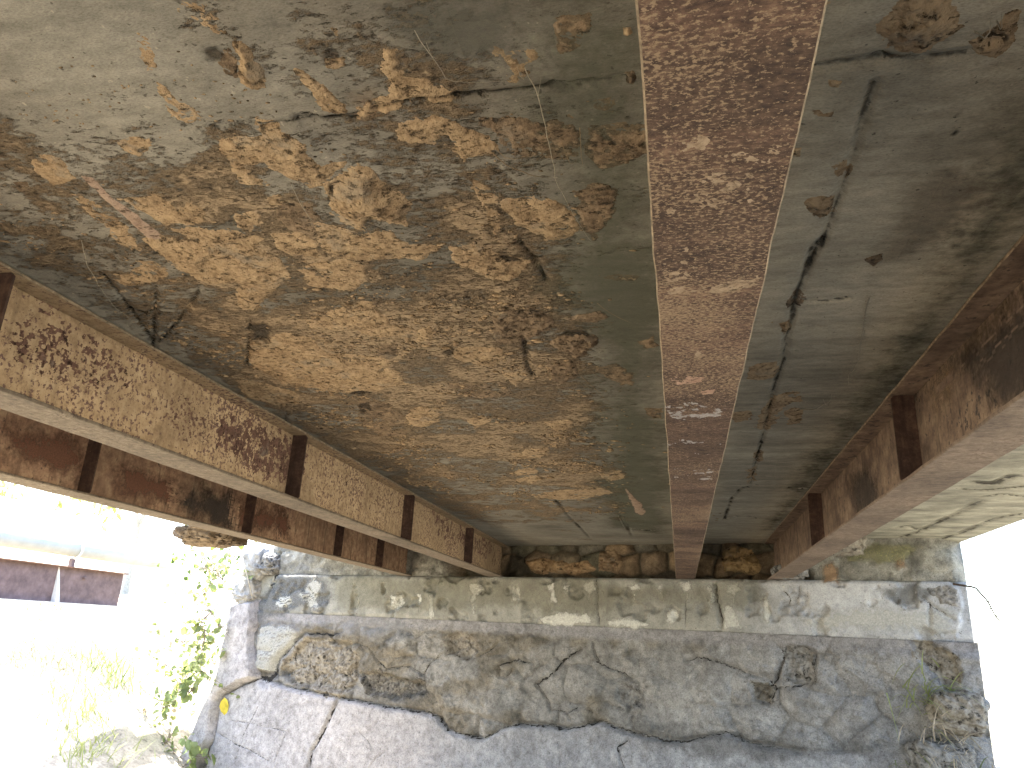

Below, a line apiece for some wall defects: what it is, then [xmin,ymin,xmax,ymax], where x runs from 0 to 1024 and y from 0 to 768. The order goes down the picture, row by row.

crack [288,74,626,121]
spalling [293,46,651,169]
spalling [218,116,347,199]
rust [2,297,292,489]
crack [123,292,198,346]
spalling [13,154,534,432]
crack [724,176,846,519]
rust [947,303,1024,401]
rust [114,465,289,538]
rust [851,472,878,513]
spalling [279,633,429,699]
crack [245,632,817,768]